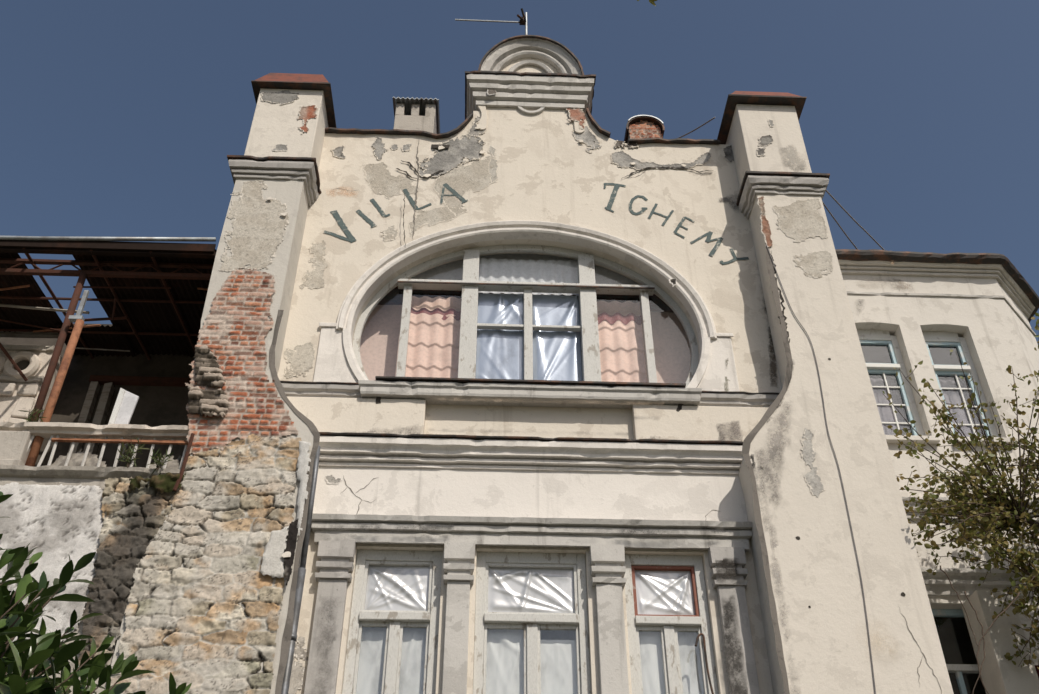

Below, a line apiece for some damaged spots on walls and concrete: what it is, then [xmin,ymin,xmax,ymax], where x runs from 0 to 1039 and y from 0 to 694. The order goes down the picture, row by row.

spalling [261,90,318,134]
spalling [363,116,498,242]
spalling [566,108,734,171]
spalling [757,196,833,278]
spalling [78,180,315,694]
crack [343,478,375,515]
spalling [800,428,826,497]
damp [722,601,748,694]
crack [899,607,942,694]